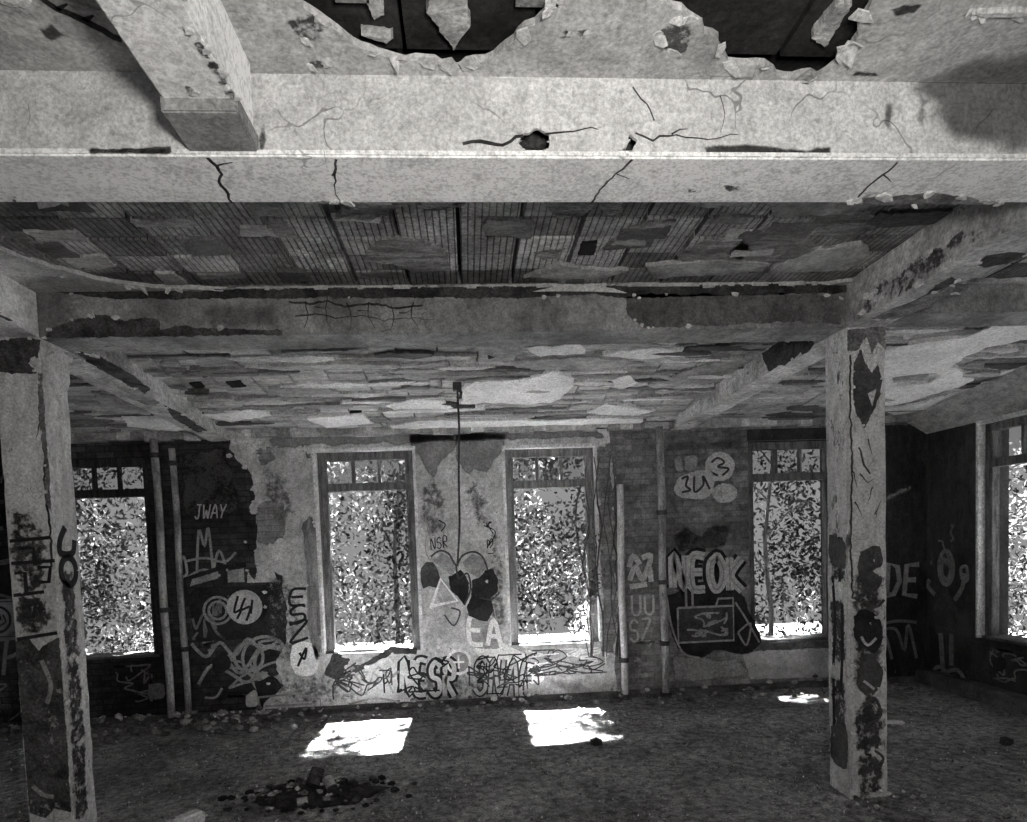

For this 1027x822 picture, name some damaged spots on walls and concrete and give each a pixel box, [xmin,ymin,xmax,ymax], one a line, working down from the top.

flaking render [1,0,32,8]
peeling [183,27,243,101]
flaking render [288,0,563,76]
flaking render [653,0,874,78]
crack [206,158,233,203]
crack [462,127,598,147]
crack [590,87,738,203]
damp [922,82,1027,145]
flaking render [0,185,1027,428]
flaking render [0,313,826,513]